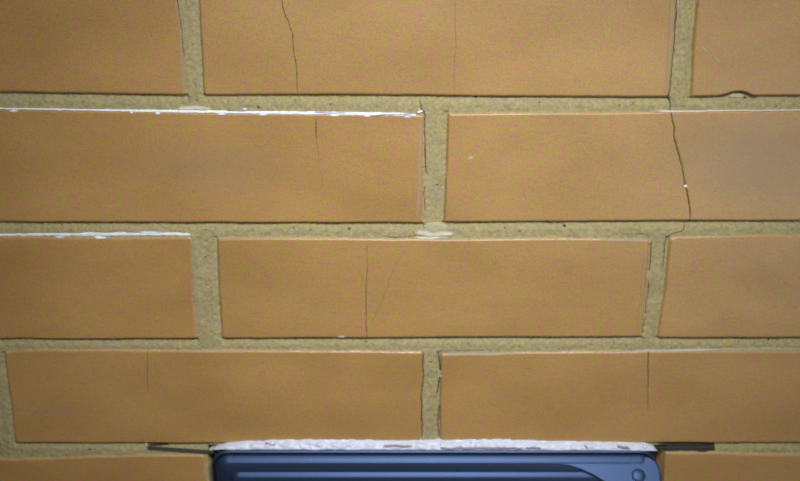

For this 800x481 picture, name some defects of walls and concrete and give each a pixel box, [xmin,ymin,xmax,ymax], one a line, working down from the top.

crack [282,0,298,93]
crack [621,0,691,333]
crack [365,234,418,338]